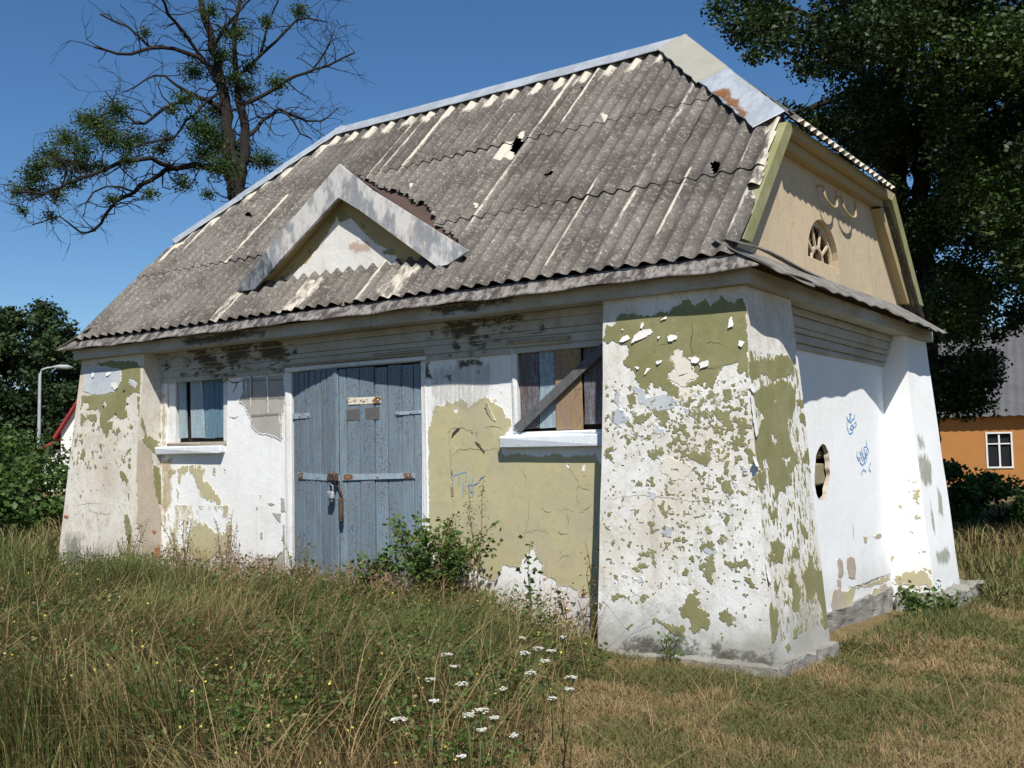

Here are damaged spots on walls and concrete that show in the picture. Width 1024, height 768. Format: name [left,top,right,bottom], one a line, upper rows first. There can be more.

rust [712,87,749,118]
peeling [69,360,232,563]
spalling [256,495,286,523]
crack [447,426,500,506]
peeling [428,295,933,652]